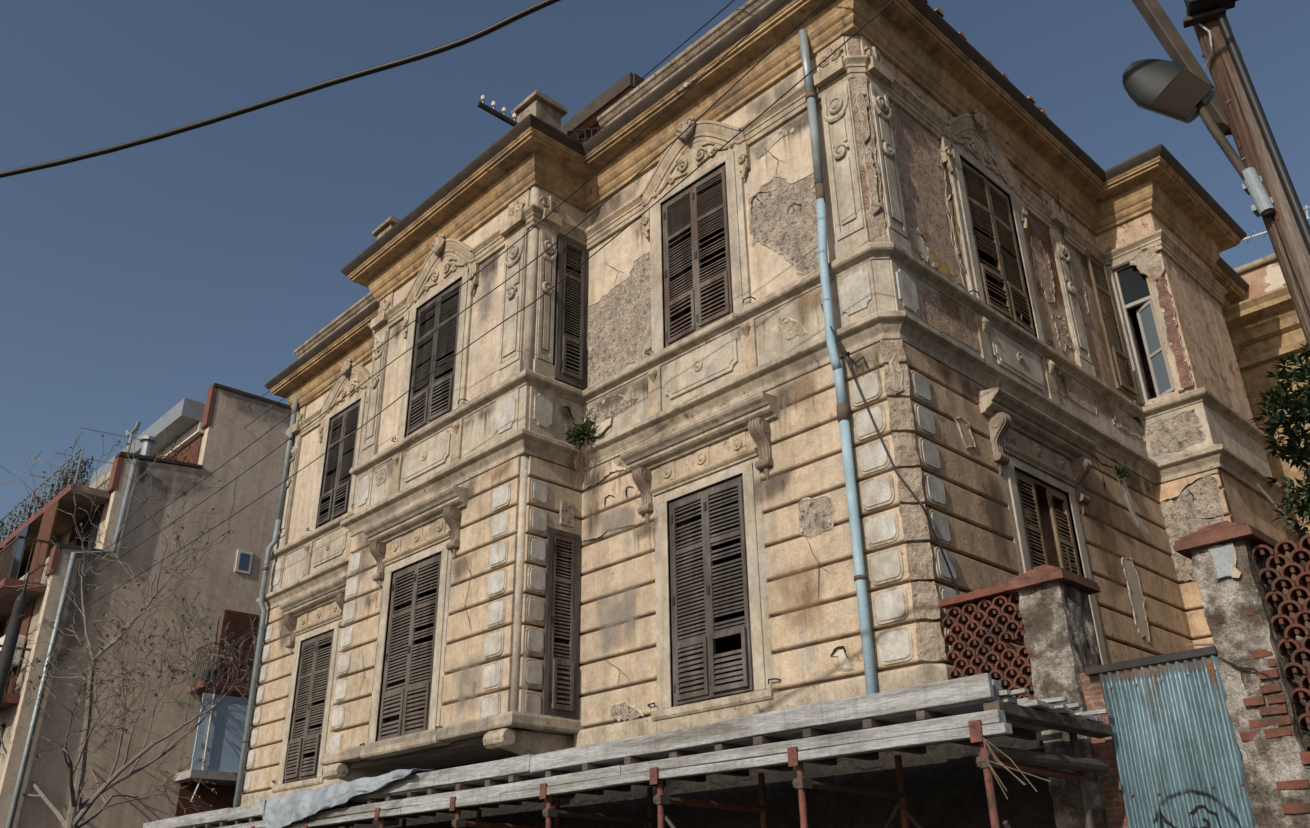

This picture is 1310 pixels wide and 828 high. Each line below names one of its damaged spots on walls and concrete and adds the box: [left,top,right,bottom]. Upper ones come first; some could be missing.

peeling [757,121,795,159]
flaking render [748,172,819,276]
flaking render [892,103,981,353]
flaking render [586,250,652,388]
flaking render [588,394,639,439]
flaking render [1159,475,1226,582]